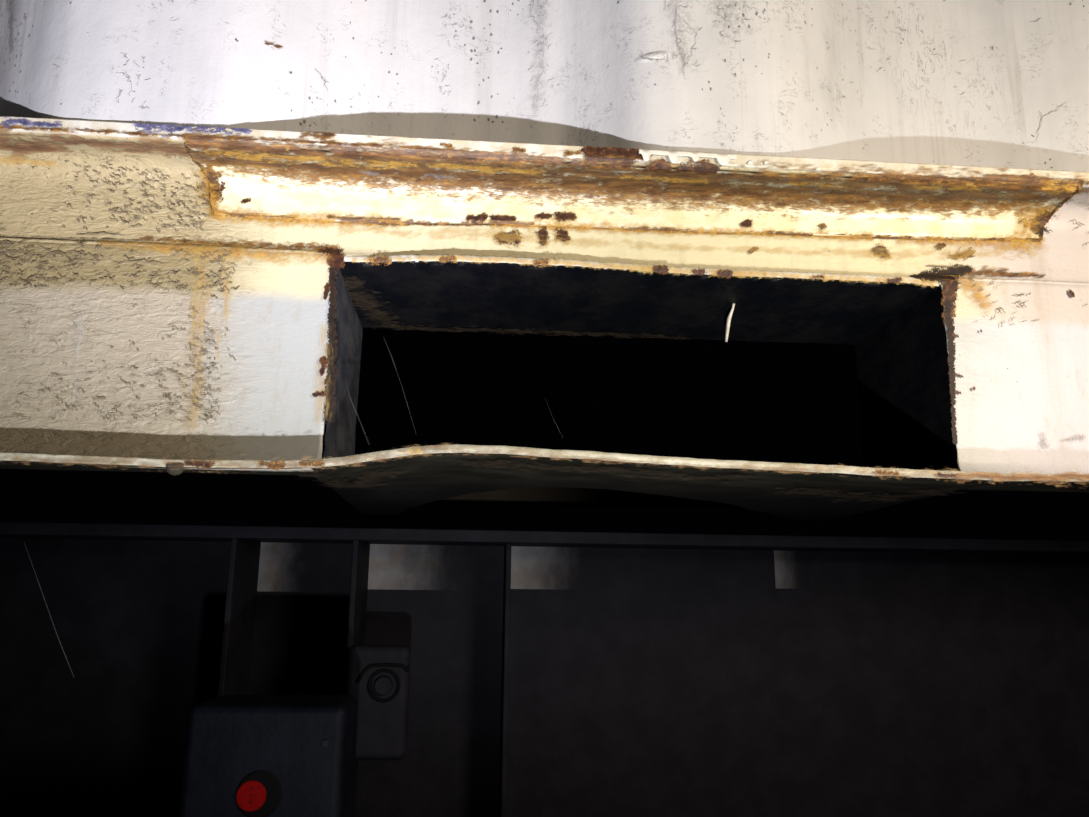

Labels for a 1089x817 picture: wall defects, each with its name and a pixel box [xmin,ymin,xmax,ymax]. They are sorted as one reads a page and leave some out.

rust [0,124,1089,444]